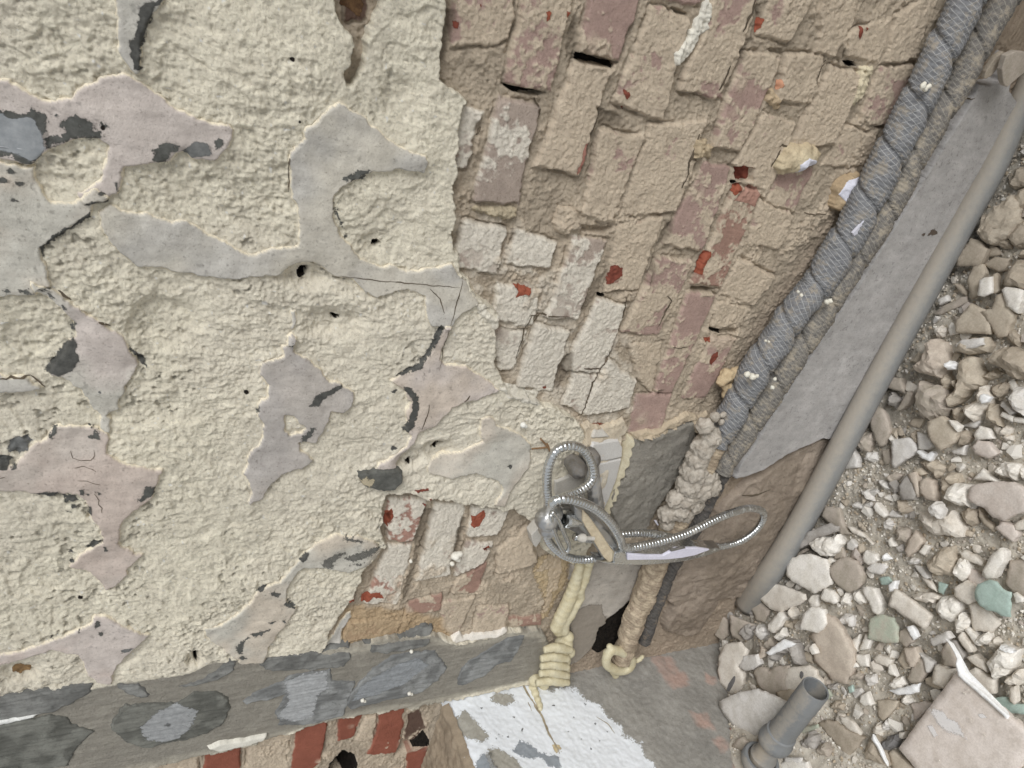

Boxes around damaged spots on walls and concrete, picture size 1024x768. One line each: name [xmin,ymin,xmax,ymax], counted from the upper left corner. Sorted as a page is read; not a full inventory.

spalling [978,0,1024,79]
spalling [0,0,946,590]
crack [578,346,613,416]
spalling [204,416,570,665]
spalling [635,597,737,658]